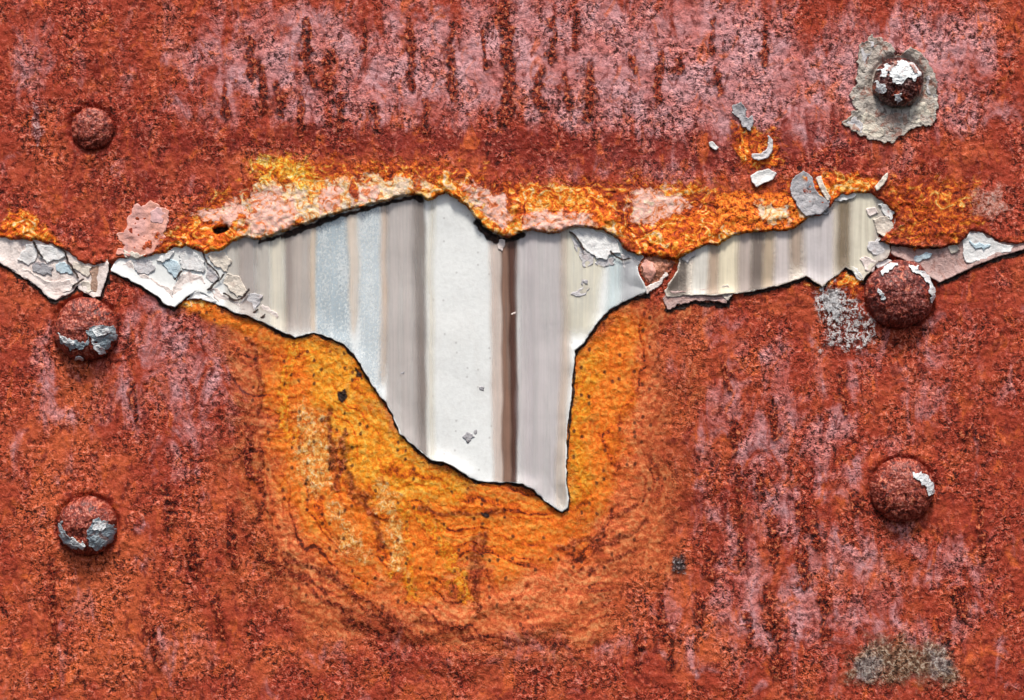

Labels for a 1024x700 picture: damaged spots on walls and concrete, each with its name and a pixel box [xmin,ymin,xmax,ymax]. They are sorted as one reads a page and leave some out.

corrosion [0,208,62,246]
corrosion [210,16,353,141]
corrosion [480,0,600,128]
corrosion [153,152,985,265]
corrosion [626,49,685,116]
peeling [732,102,754,131]
corrosion [727,119,785,172]
peeling [750,135,777,187]
peeling [842,34,939,144]
peeling [0,171,1024,512]
corrosion [181,300,692,650]
peeling [58,517,117,551]